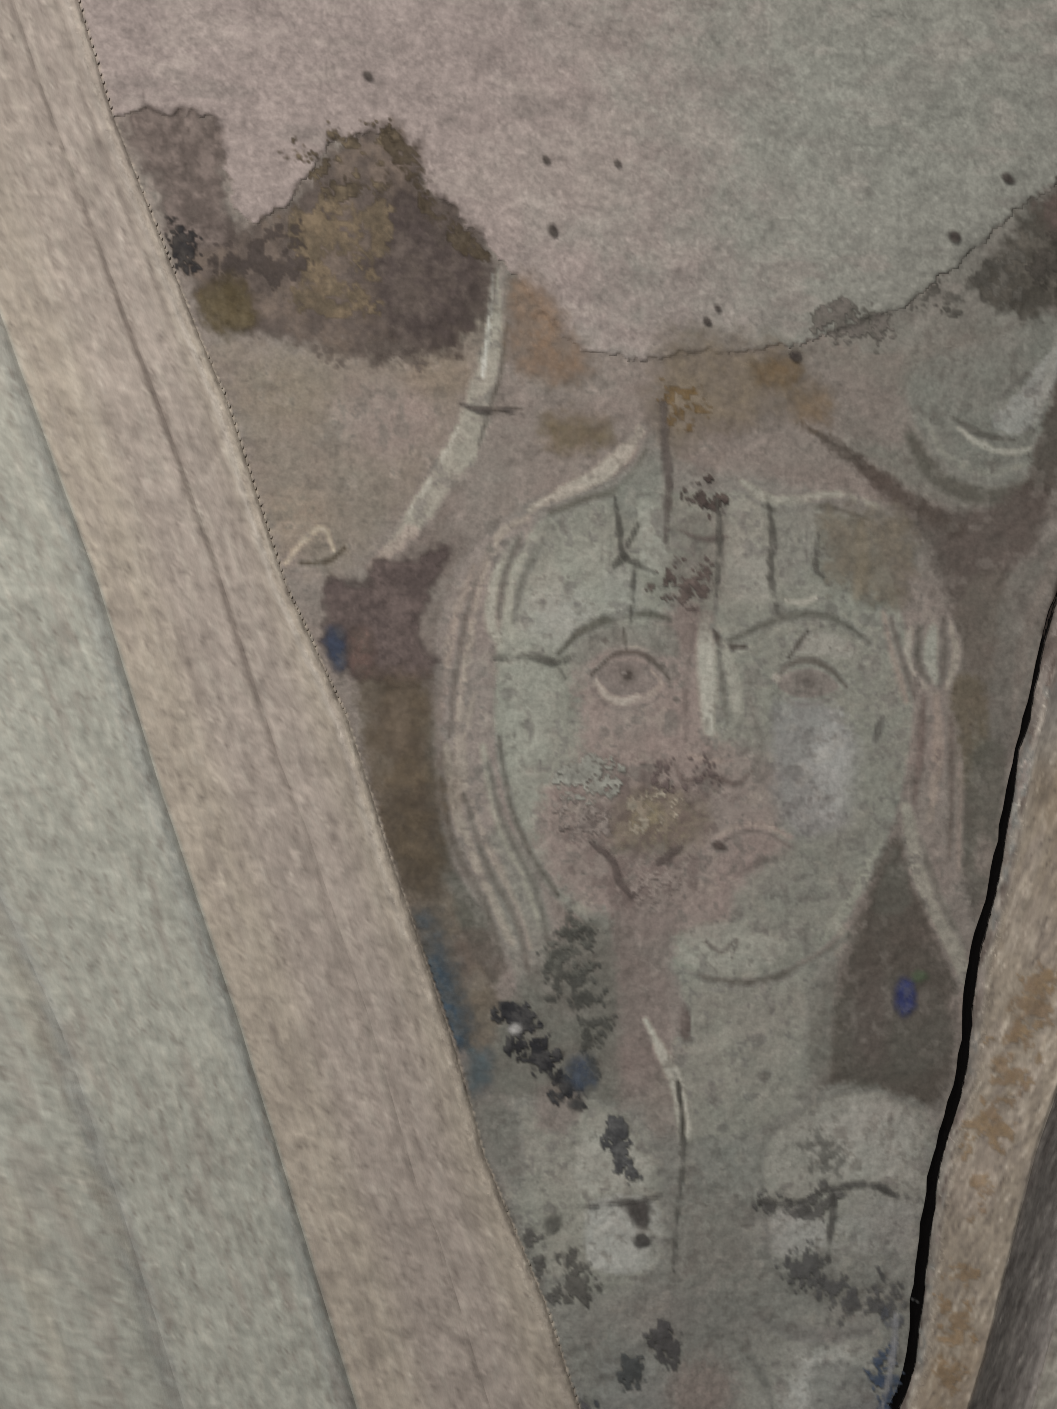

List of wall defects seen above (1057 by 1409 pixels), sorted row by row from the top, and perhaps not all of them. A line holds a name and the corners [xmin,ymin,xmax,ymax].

crack [758,583,1057,1409]